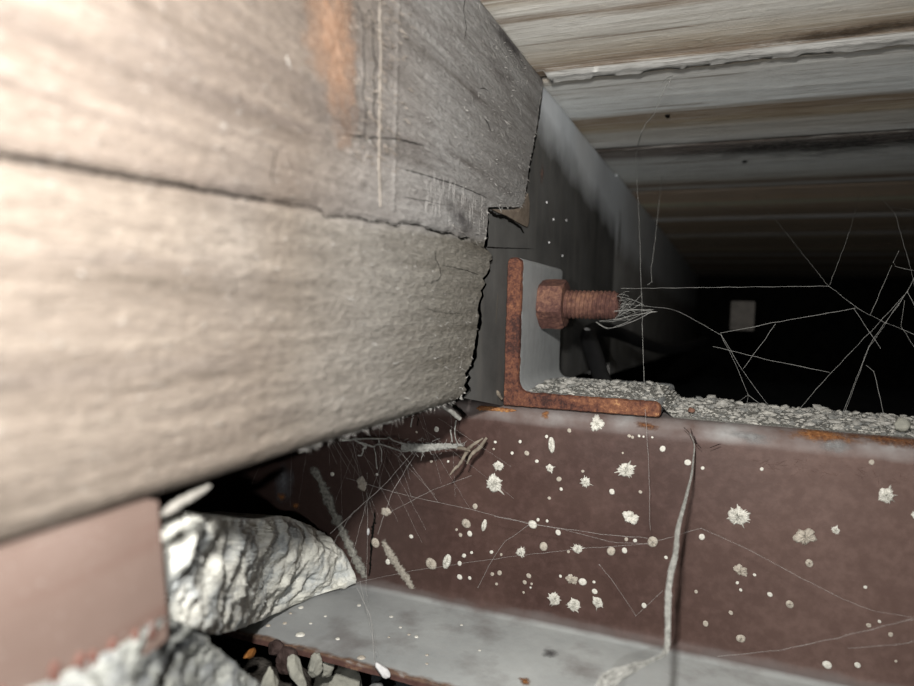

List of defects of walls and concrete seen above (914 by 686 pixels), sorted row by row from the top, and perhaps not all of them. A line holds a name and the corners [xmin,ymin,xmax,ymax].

crack [0,151,530,282]
corrosion [798,429,914,446]